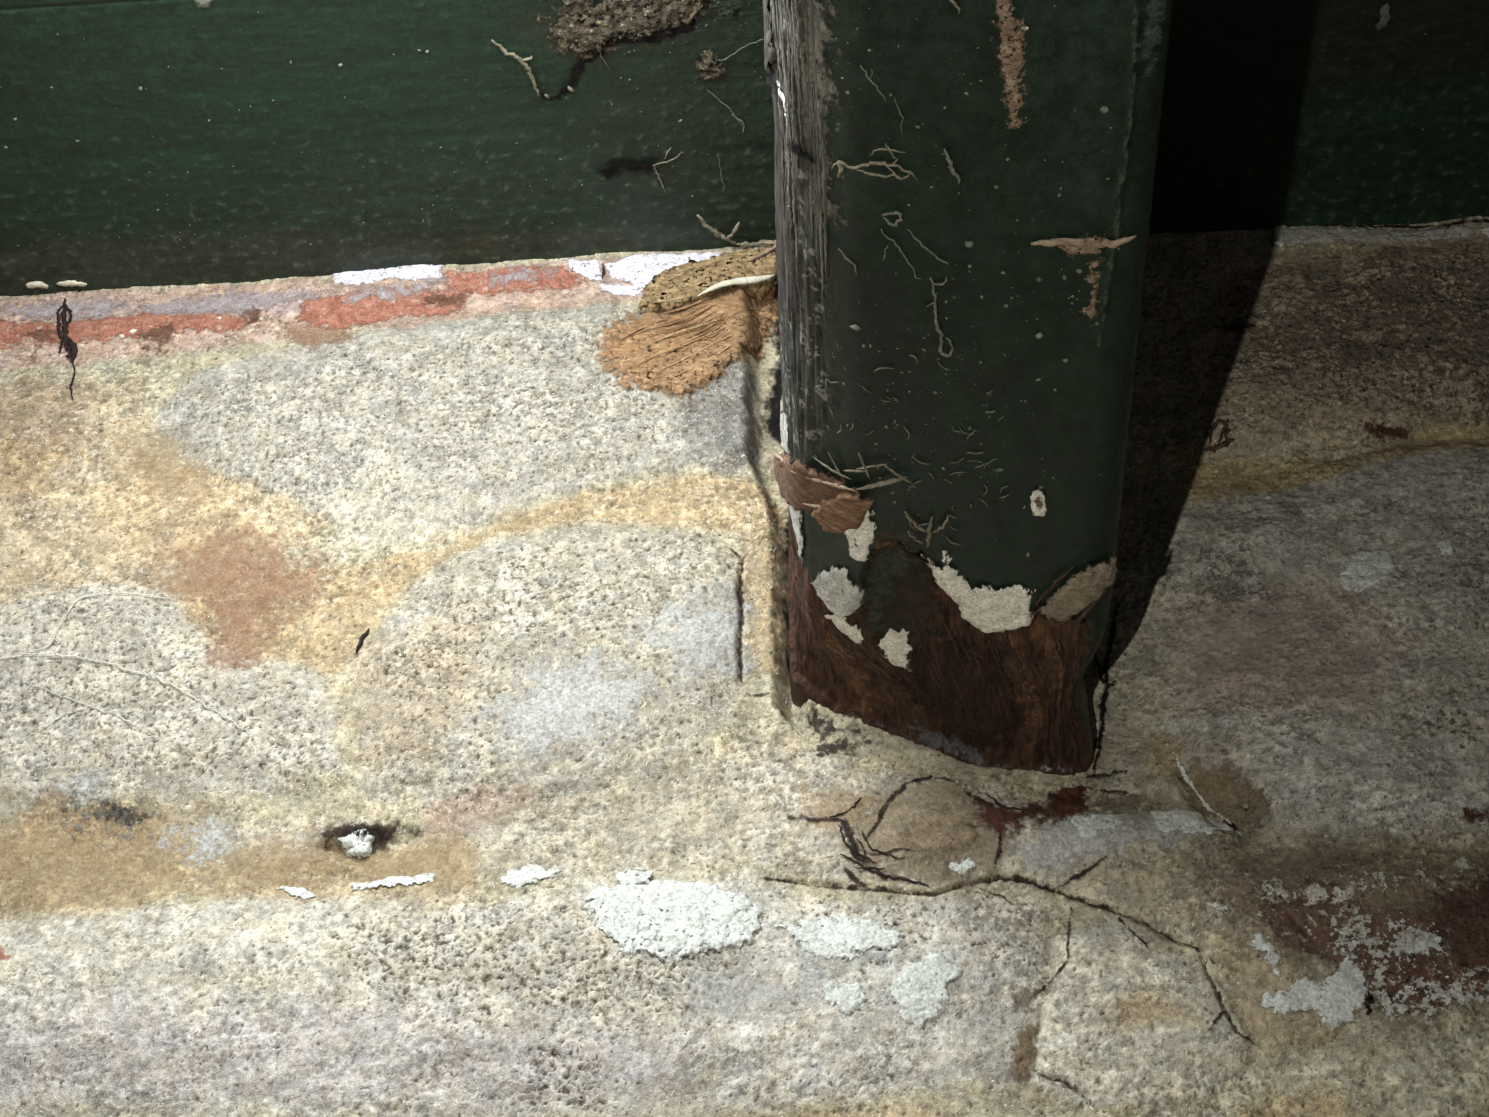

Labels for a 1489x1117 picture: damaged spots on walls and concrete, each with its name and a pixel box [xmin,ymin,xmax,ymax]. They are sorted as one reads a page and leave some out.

peeling [780,399,790,454]
peeling [789,505,803,561]
peeling [1030,490,1047,516]
peeling [811,510,912,671]
peeling [921,551,1117,633]
crack [763,856,1255,1044]